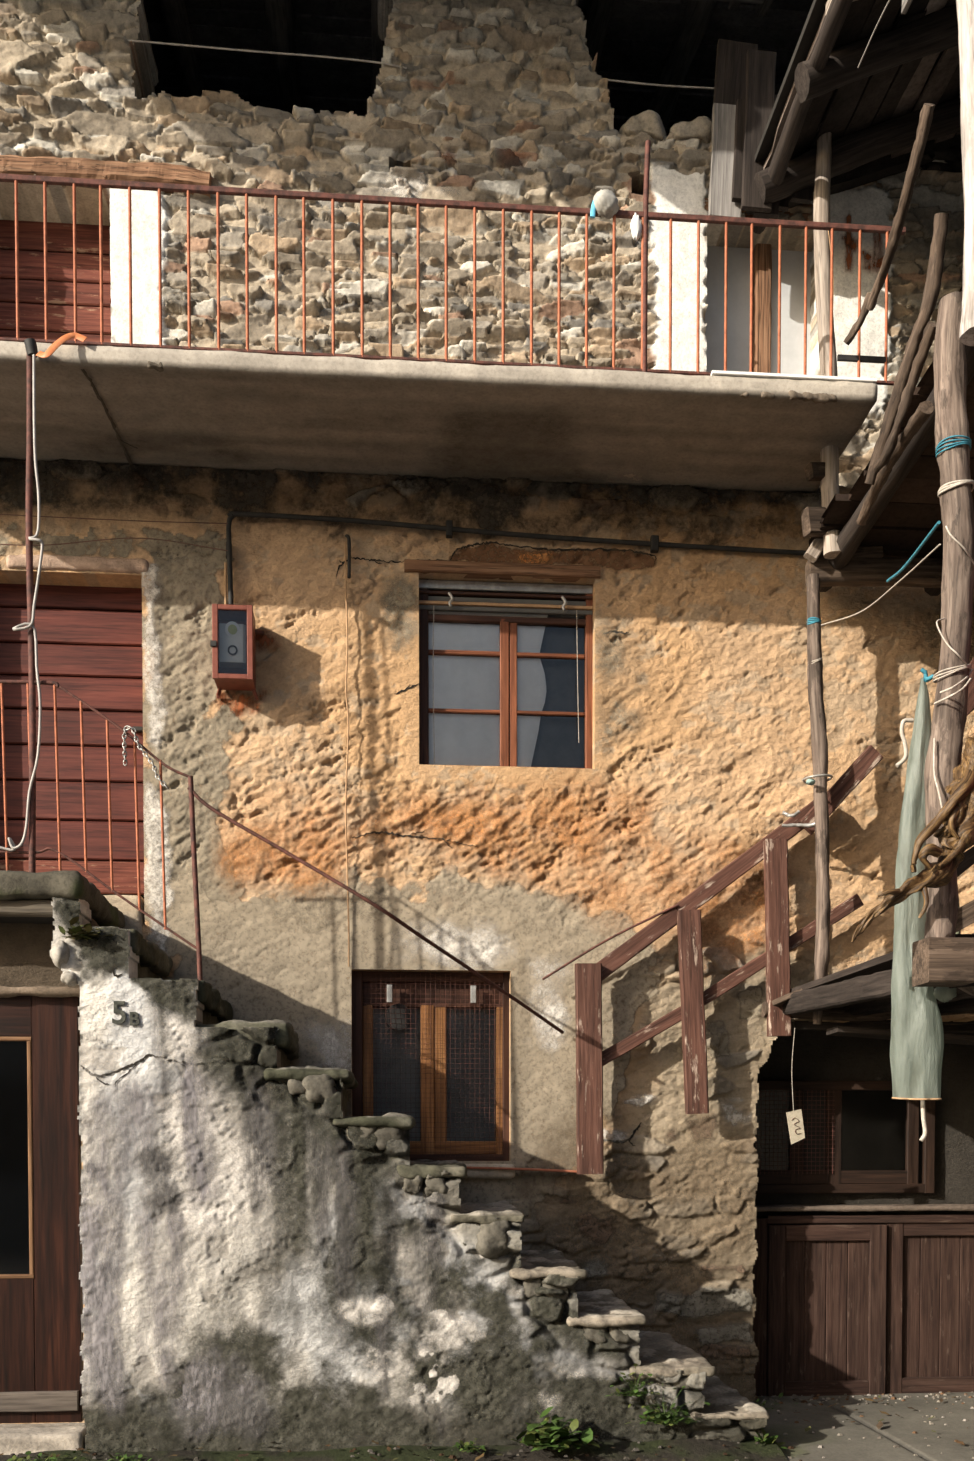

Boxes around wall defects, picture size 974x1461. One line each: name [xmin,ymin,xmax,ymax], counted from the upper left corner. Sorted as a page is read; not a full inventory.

crack [81,369,138,465]
corrosion [220,691,266,717]
flaking render [0,522,664,1251]
leakage [59,899,130,978]
crack [81,1054,229,1087]
spalling [666,1116,718,1142]
leakage [79,982,614,1452]
spalling [655,1264,753,1360]